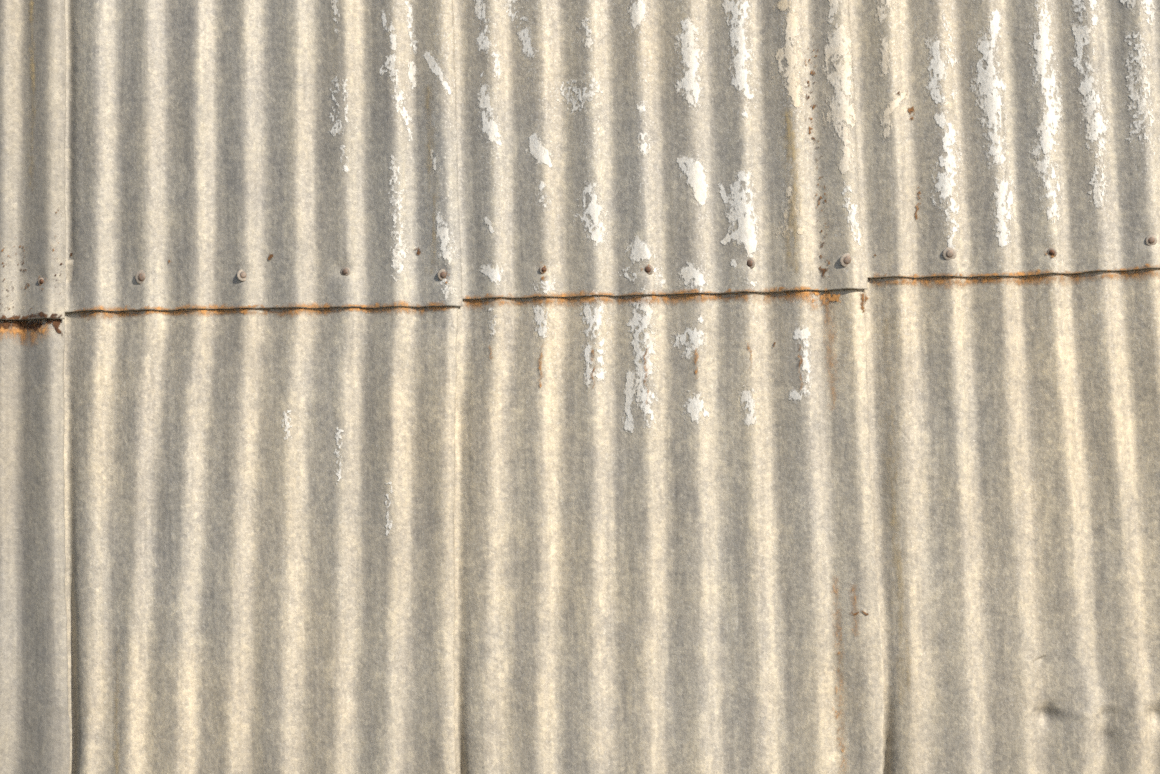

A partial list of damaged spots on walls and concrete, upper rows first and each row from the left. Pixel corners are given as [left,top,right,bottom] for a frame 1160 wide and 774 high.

rust [77,302,446,317]
peeling [379,1,451,141]
rust [466,289,749,306]
peeling [618,235,665,433]
peeling [677,155,761,268]
rust [765,230,840,305]
peeling [822,0,862,245]
peeling [925,17,962,248]
peeling [971,9,1016,246]
rust [877,264,1153,285]
peeling [1029,0,1065,222]
peeling [1071,0,1109,208]